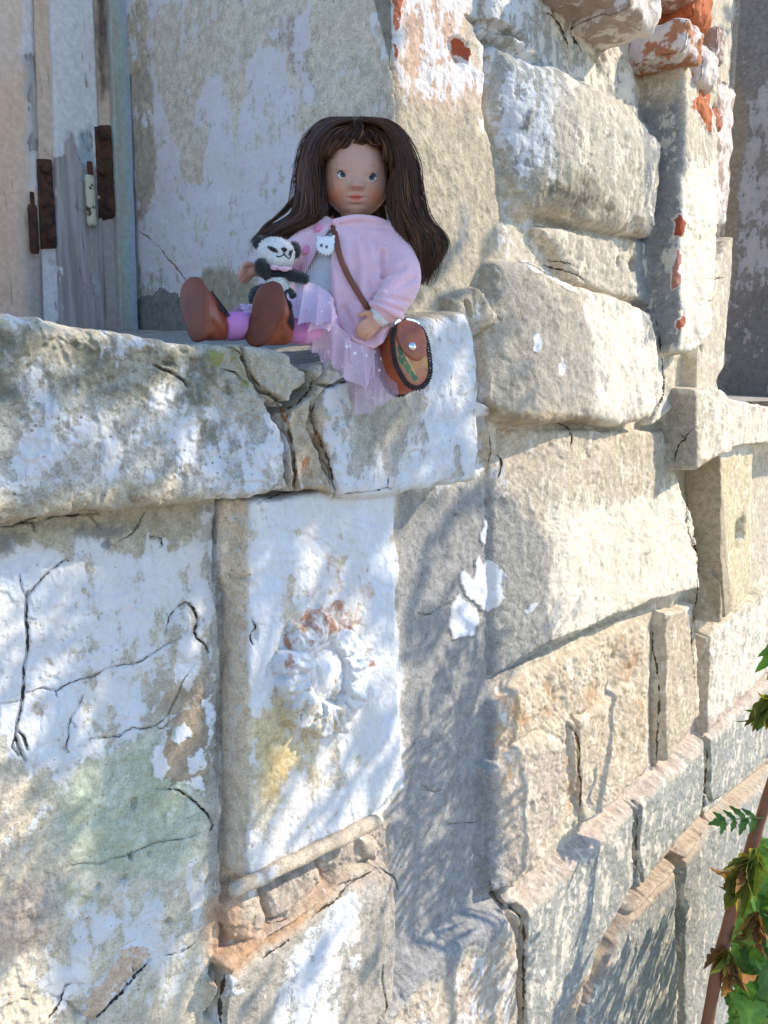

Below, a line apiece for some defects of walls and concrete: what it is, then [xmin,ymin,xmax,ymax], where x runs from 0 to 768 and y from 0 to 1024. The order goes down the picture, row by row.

flaking render [447,33,473,64]
flaking render [687,68,714,136]
flaking render [669,213,689,335]
crack [154,364,186,385]
crack [224,348,389,501]
peeling [445,517,507,641]
crack [4,560,209,757]
flaking render [146,689,218,798]
crack [651,631,661,764]
crack [76,788,214,865]
crack [96,945,192,1018]
crack [489,881,526,1023]